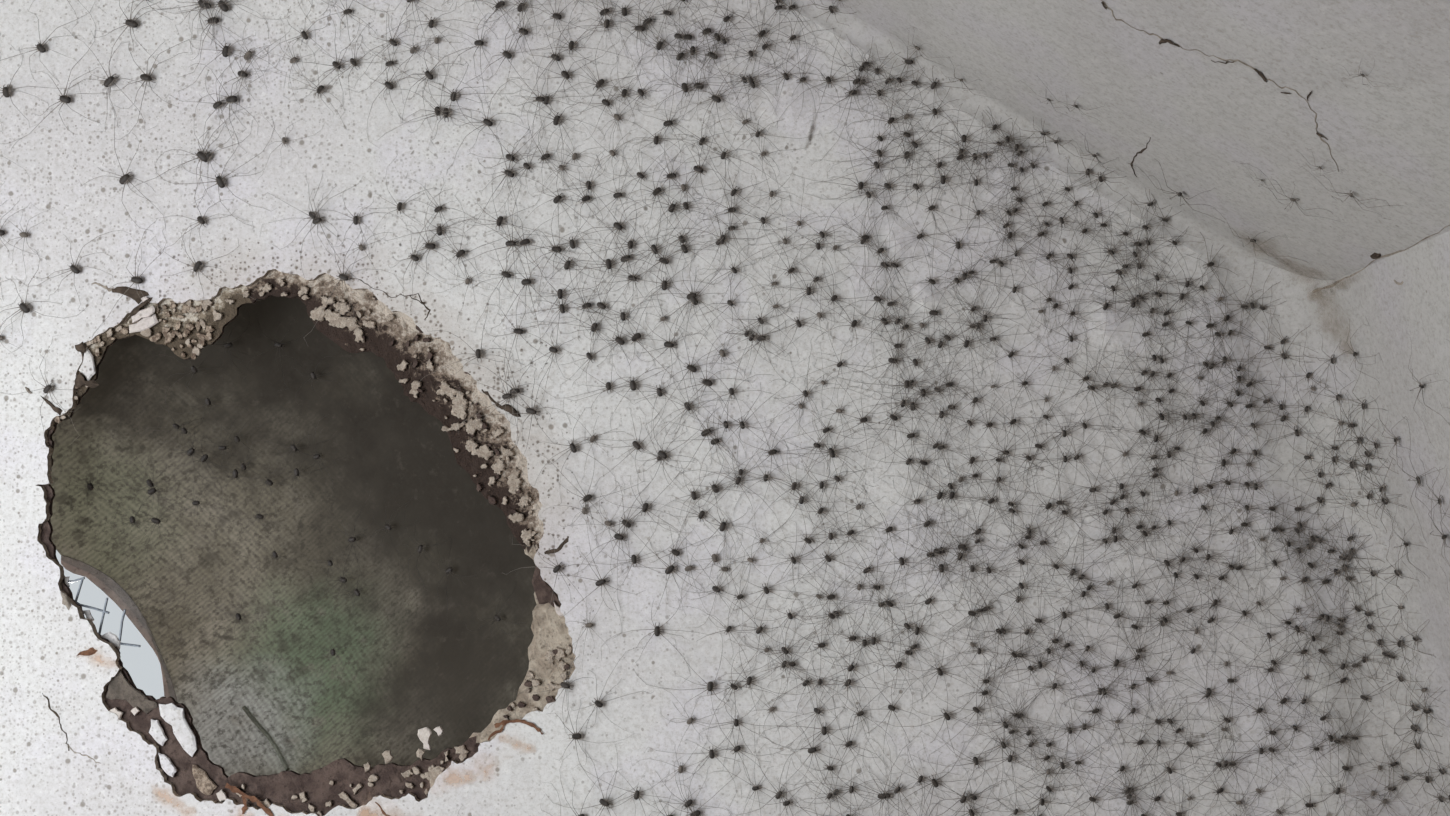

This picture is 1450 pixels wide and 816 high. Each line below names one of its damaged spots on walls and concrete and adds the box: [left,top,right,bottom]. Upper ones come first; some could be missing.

crack [1101,0,1339,177]
crack [1312,225,1450,293]
flaking render [25,270,576,816]
crack [42,693,99,763]